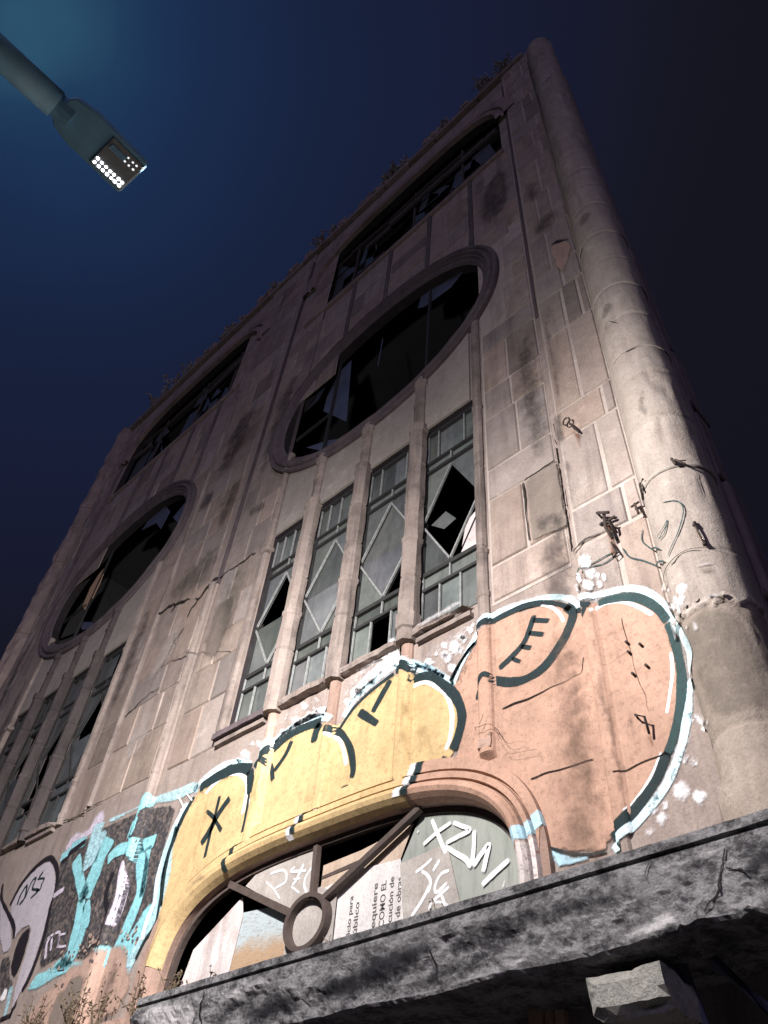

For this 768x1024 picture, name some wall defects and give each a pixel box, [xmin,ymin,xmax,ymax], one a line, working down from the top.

crack [124,552,256,718]
crack [704,847,744,913]